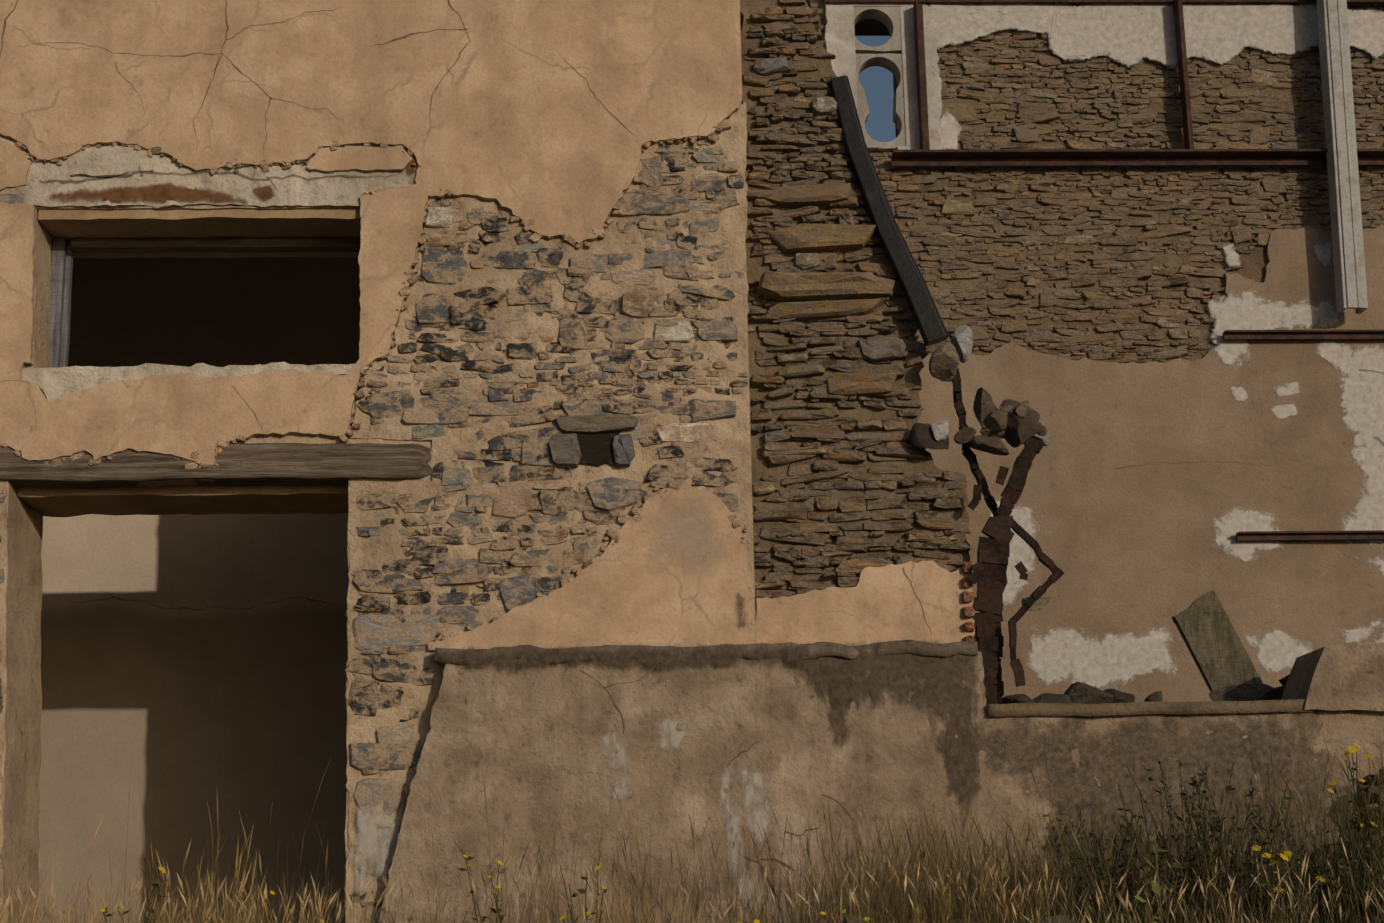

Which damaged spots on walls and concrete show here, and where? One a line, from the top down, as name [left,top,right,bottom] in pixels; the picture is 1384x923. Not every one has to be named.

crack [0,0,471,191]
peeling [824,3,1320,150]
peeling [1347,9,1384,58]
peeling [1223,244,1240,267]
peeling [1208,290,1384,575]
flaking render [0,102,750,923]
peeling [990,500,1037,605]
peeling [1028,627,1177,688]
peeling [1246,629,1312,673]
peeling [1342,620,1384,643]
water stain [441,642,980,806]